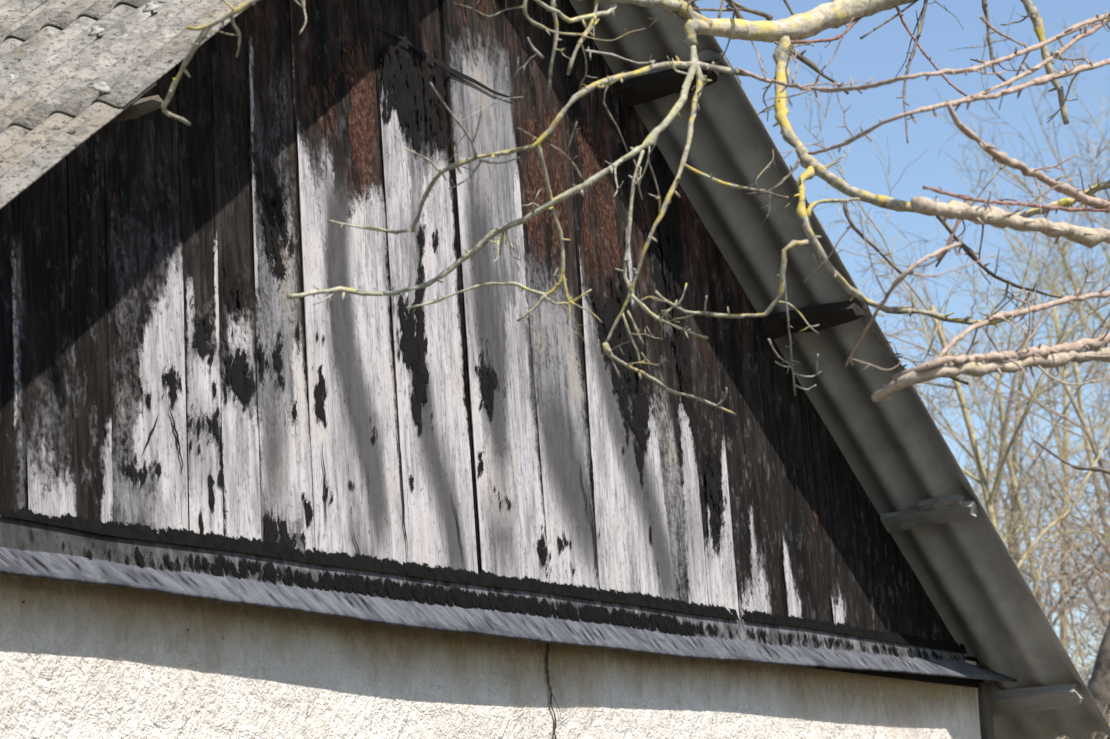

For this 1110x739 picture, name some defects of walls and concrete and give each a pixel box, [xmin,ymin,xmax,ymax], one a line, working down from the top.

peeling [0,37,967,661]
crack [546,643,561,739]